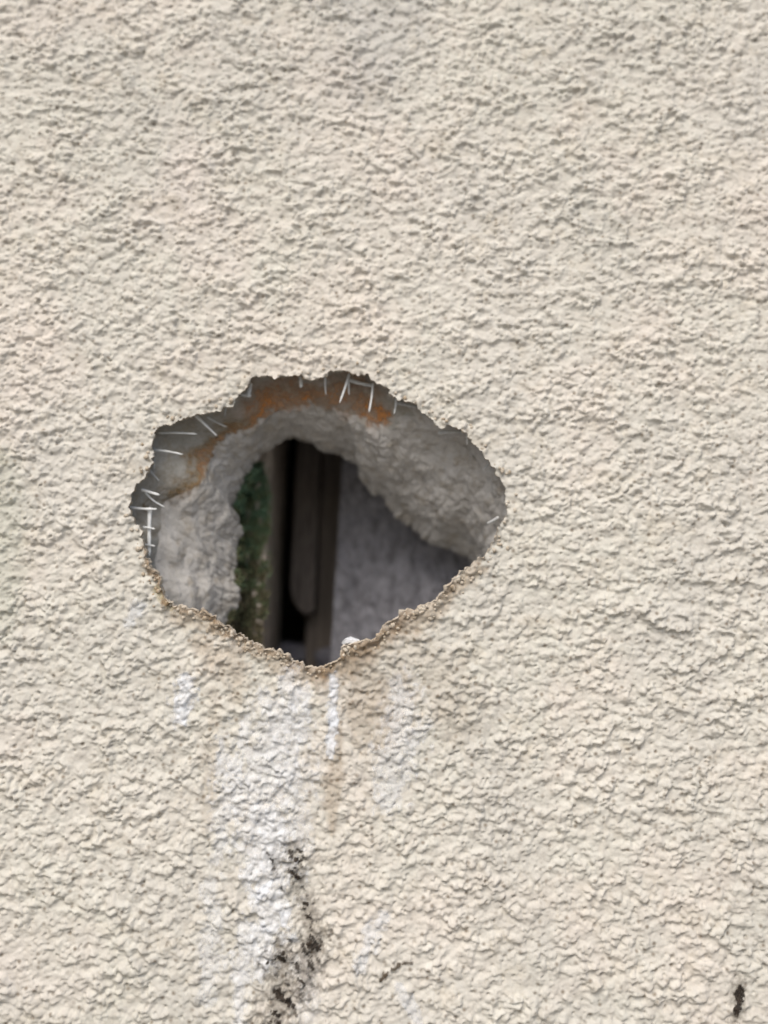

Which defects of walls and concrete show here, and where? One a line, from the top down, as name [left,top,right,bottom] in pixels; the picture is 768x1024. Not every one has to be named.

rust [170,375,391,494]
spalling [124,357,518,678]
water stain [174,673,199,725]
water stain [325,675,338,759]
water stain [230,672,322,1024]
water stain [379,962,413,982]